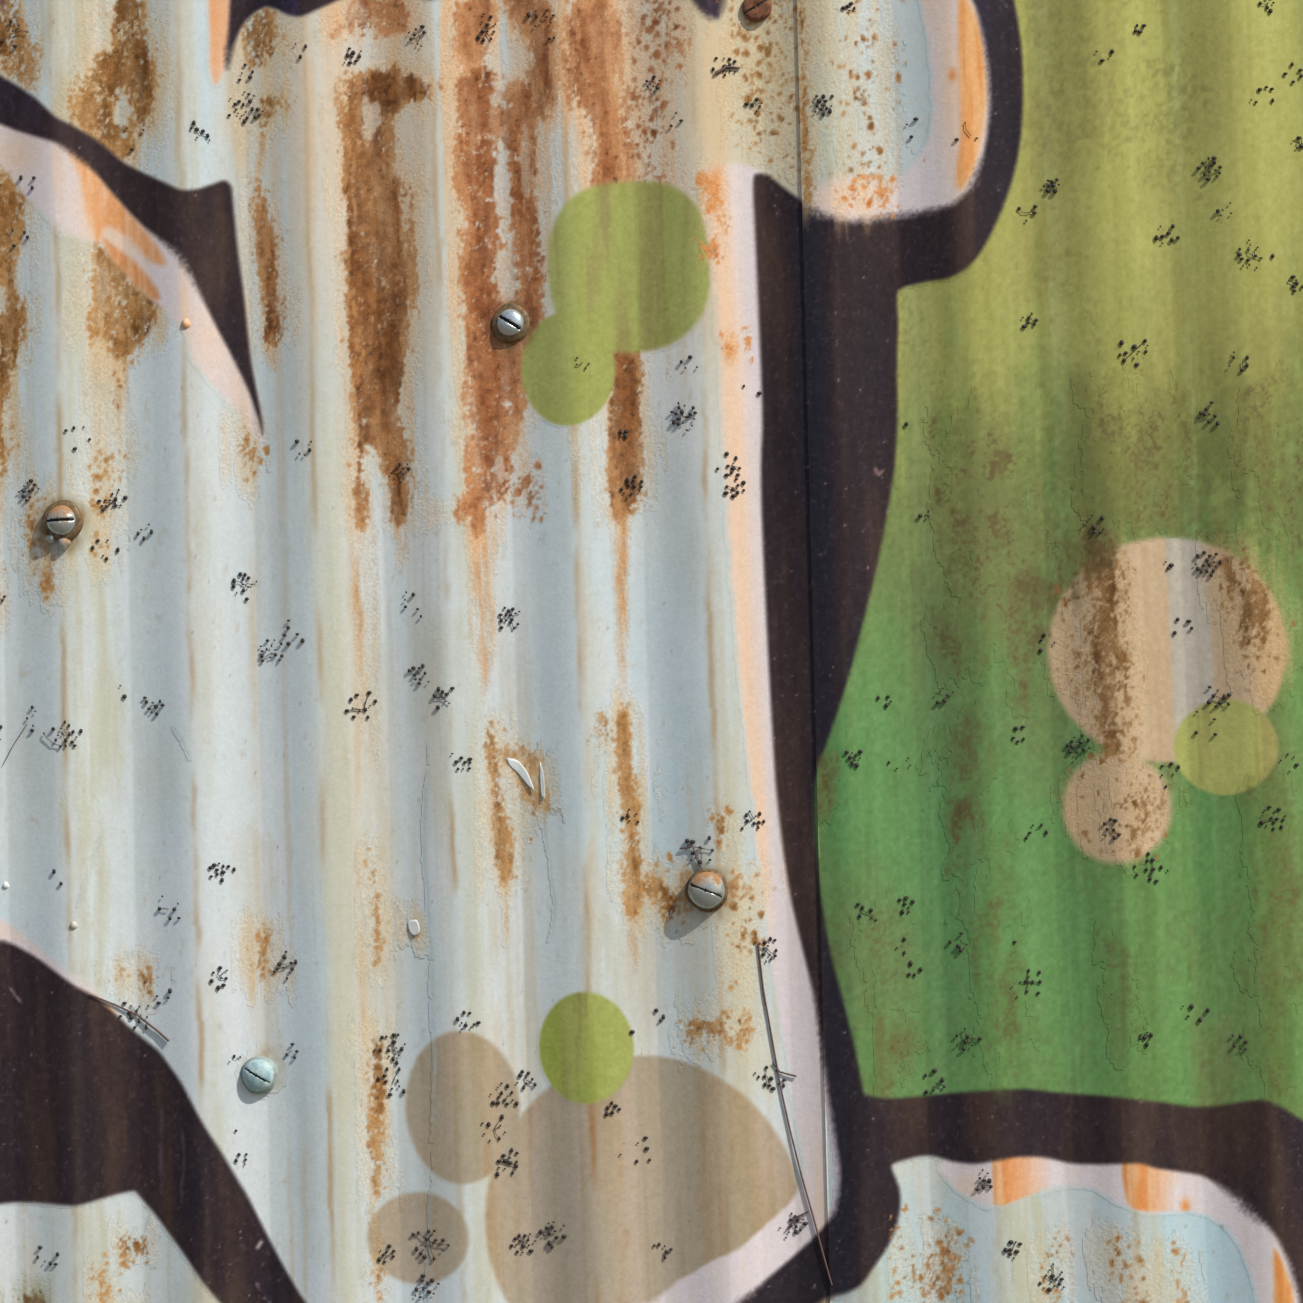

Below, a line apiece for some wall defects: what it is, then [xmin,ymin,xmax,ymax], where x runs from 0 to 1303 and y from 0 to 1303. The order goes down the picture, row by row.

rust [0,0,179,172]
rust [0,170,179,645]
rust [227,0,926,949]
rust [567,354,789,1072]
rust [1047,523,1190,876]
rust [1195,521,1303,714]
rust [884,1201,981,1303]
rust [1011,1216,1212,1303]